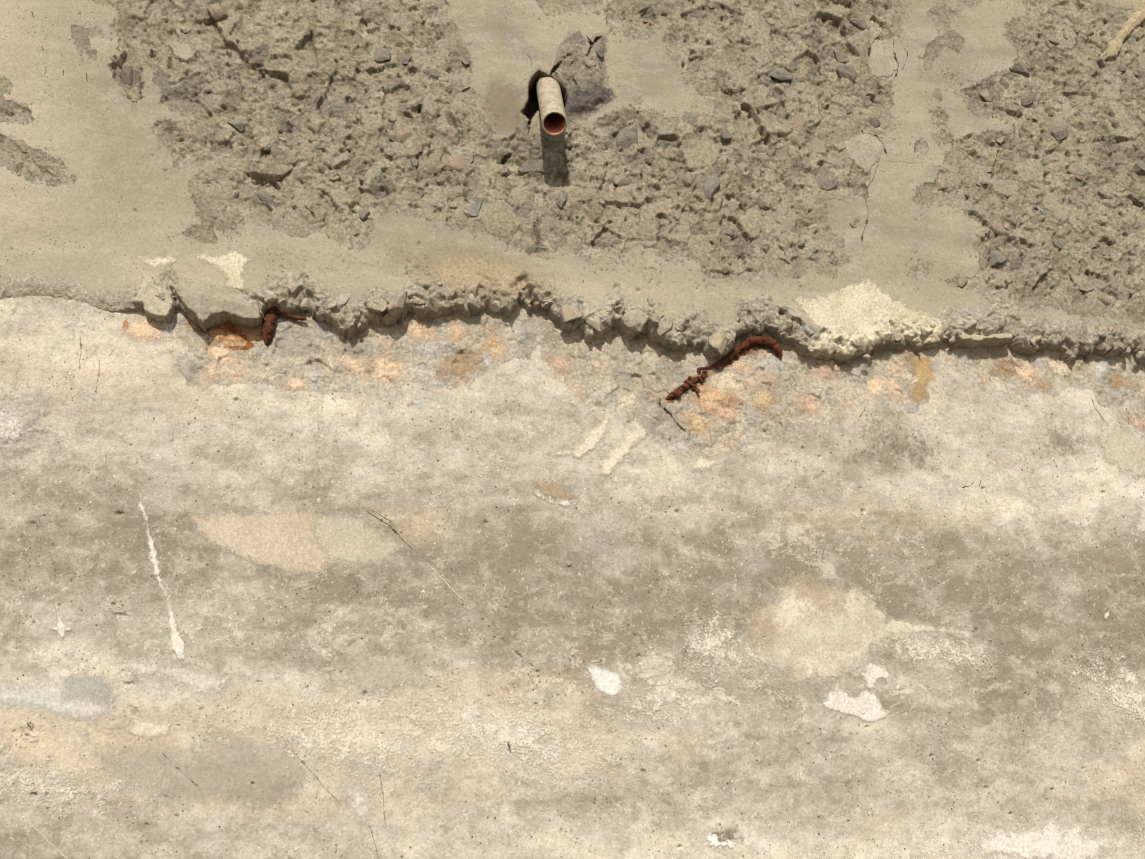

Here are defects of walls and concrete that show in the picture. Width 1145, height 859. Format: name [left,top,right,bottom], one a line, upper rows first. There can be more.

spalling [0,0,1145,460]
corrosion [186,306,307,352]
corrosion [665,335,783,417]